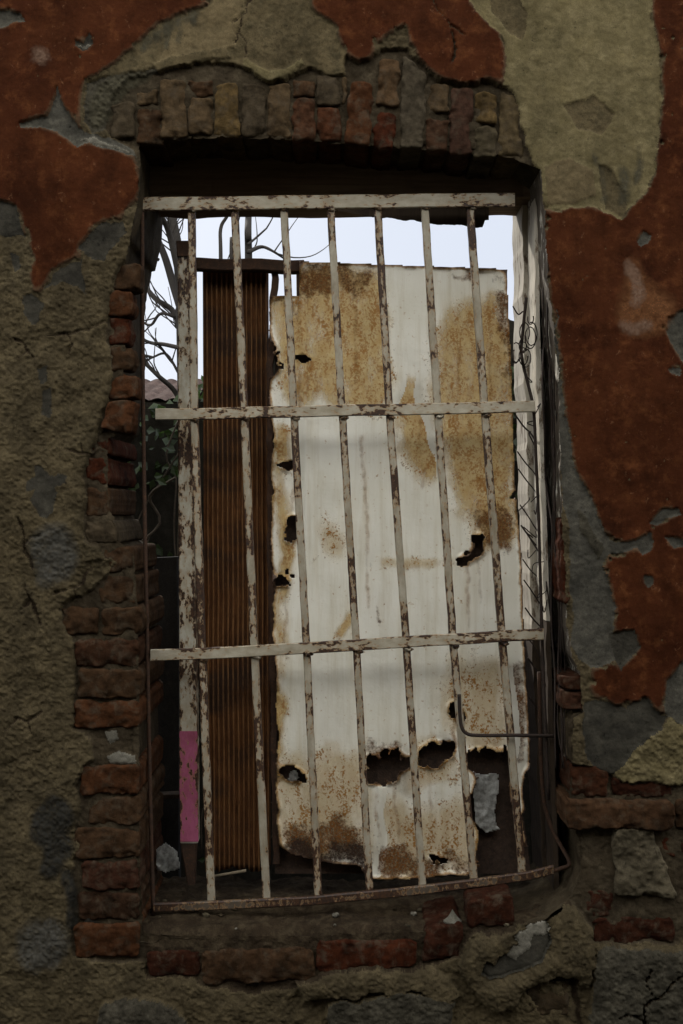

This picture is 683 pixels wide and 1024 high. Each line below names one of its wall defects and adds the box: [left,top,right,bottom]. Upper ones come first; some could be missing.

peeling [0,10,25,28]
spalling [19,0,664,220]
spalling [60,316,138,643]
rust [271,424,296,642]
rust [272,262,517,551]
peeling [554,309,683,671]
spalling [73,655,140,832]
rust [275,690,375,873]
rust [378,757,478,879]
spalling [568,662,683,949]
crack [619,971,683,1024]